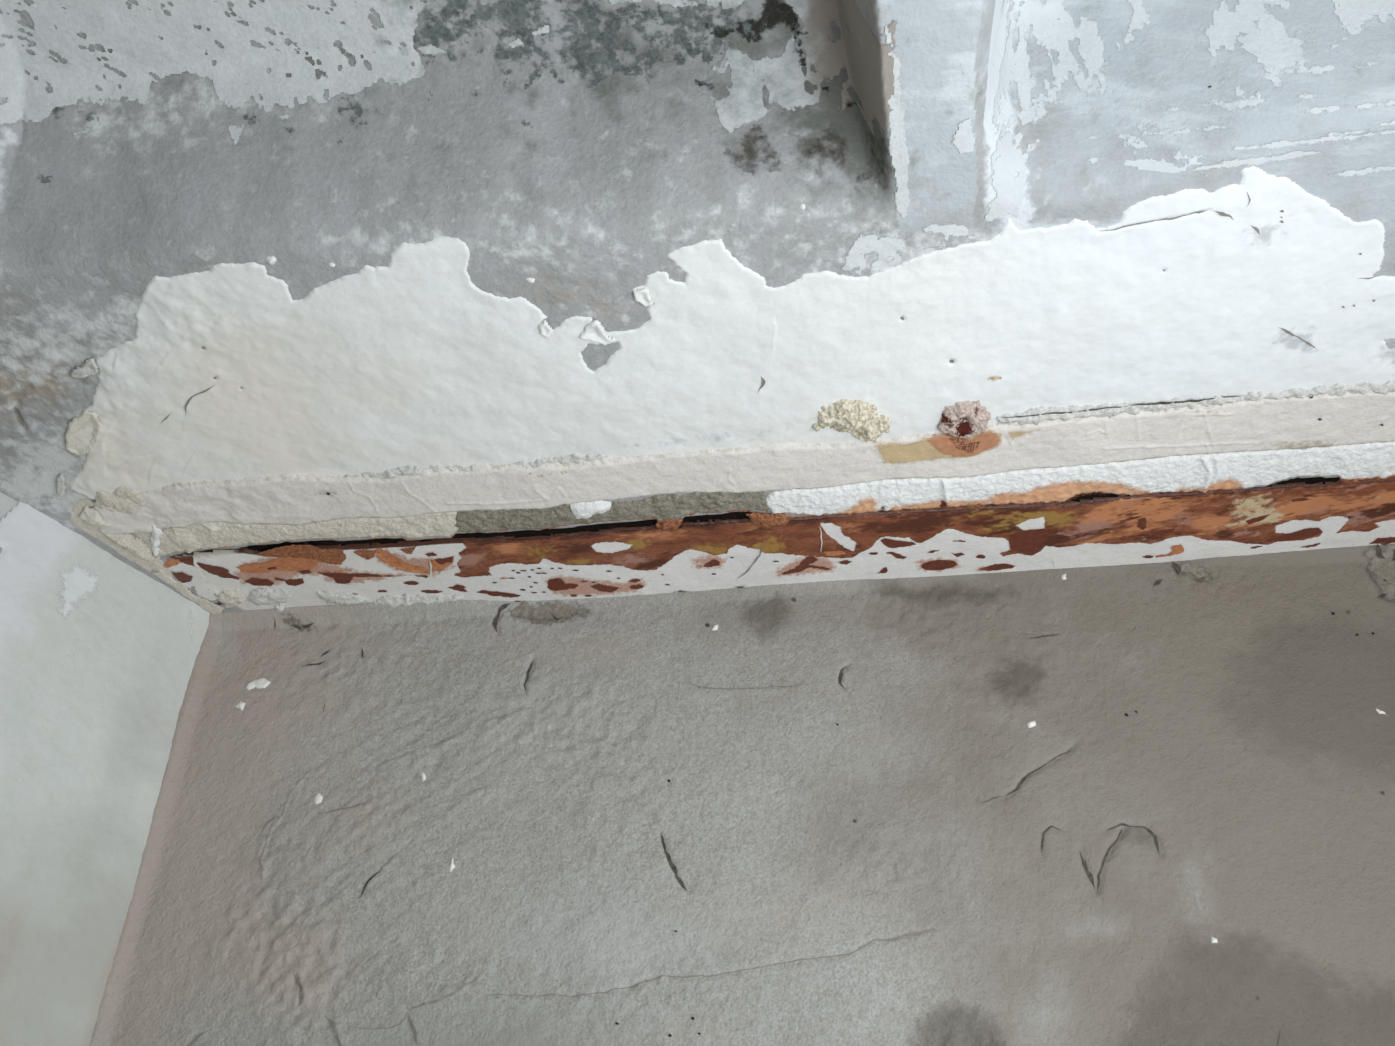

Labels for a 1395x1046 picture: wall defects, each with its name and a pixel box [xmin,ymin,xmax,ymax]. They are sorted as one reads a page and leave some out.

peeling [0,0,448,146]
peeling [508,25,550,48]
peeling [609,0,749,9]
peeling [707,0,910,219]
peeling [985,0,1150,221]
peeling [1116,0,1395,177]
peeling [841,224,975,275]
rust [163,475,1395,602]
crack [978,747,1073,804]
crack [661,834,686,890]
crack [1041,823,1160,891]
crack [293,929,933,1046]